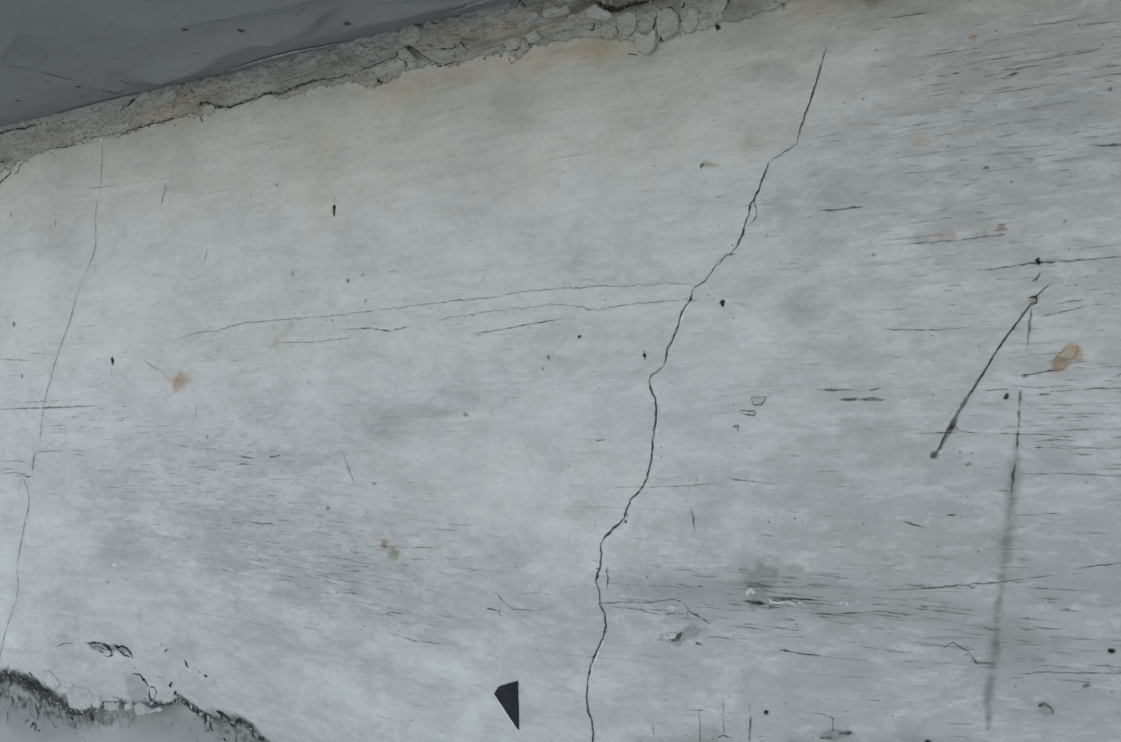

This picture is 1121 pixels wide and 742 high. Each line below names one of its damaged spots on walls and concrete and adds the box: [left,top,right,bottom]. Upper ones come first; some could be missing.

peeling [565,0,615,21]
crack [406,46,827,742]
spalling [0,642,267,742]